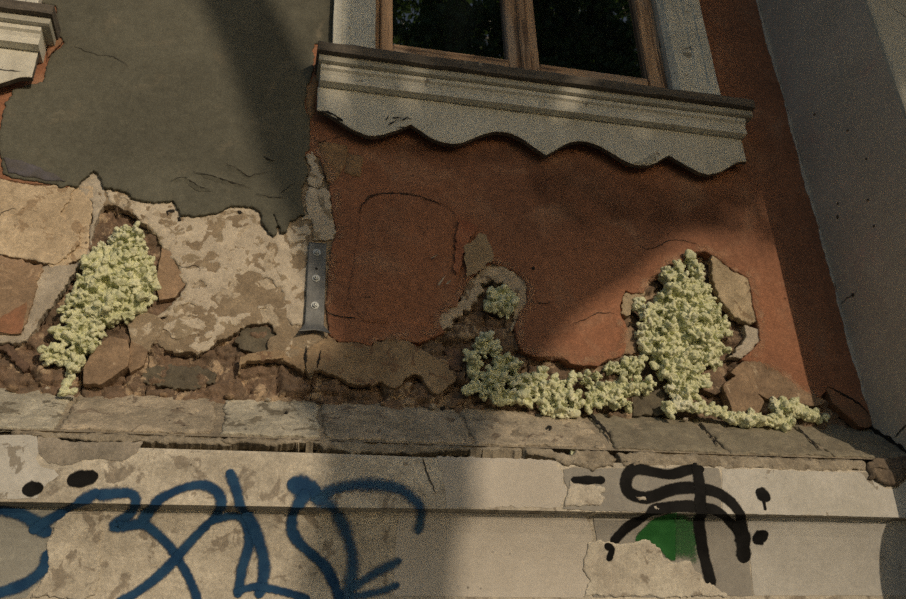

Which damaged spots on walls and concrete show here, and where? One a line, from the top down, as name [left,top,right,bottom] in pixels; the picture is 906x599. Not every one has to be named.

peeling [0,140,872,430]
flaking render [38,436,143,466]
crack [868,425,906,453]
peeling [583,539,728,599]